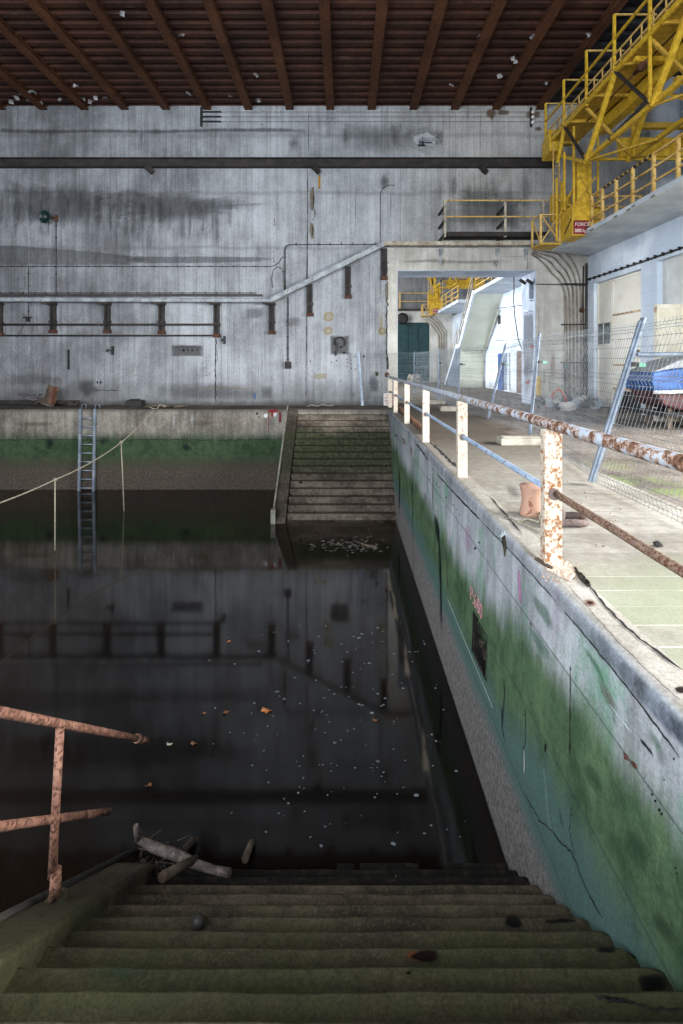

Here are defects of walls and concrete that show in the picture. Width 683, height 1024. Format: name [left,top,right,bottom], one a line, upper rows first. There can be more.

water stain [434,518,442,620]
crack [526,797,603,919]